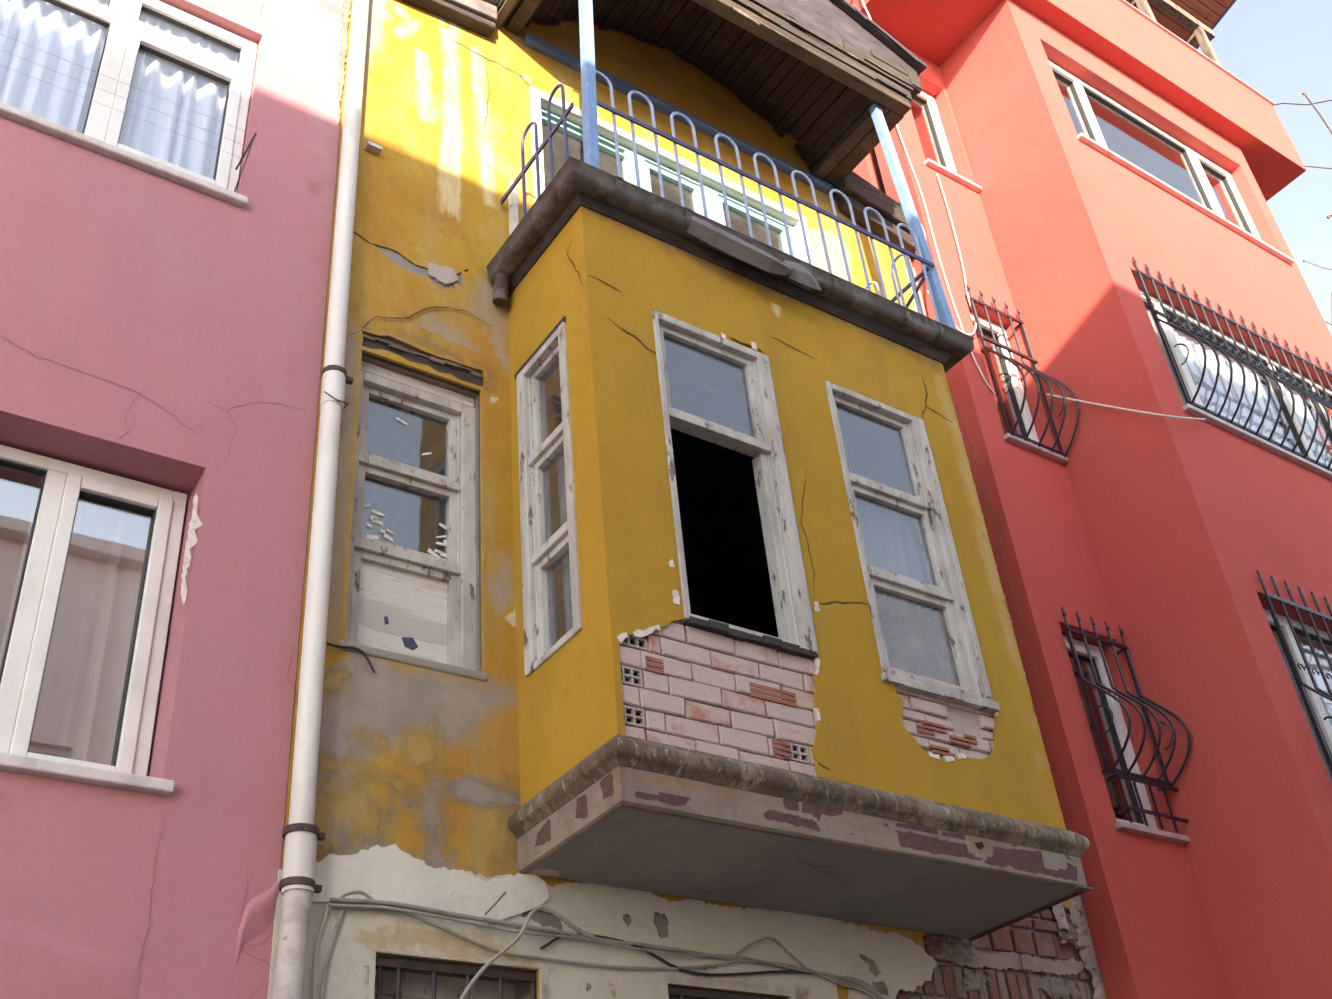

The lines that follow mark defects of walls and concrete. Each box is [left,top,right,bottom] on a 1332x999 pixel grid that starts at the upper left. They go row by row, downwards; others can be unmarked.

crack [350,306,490,335]
spalling [904,263,927,316]
crack [1,335,300,473]
crack [801,471,867,605]
spalling [617,621,821,776]
spalling [888,667,998,763]
peeling [532,815,553,854]
peeling [573,770,616,825]
peeling [632,791,700,811]
peeling [757,798,860,840]
crack [136,812,164,998]
spalling [859,817,1106,999]